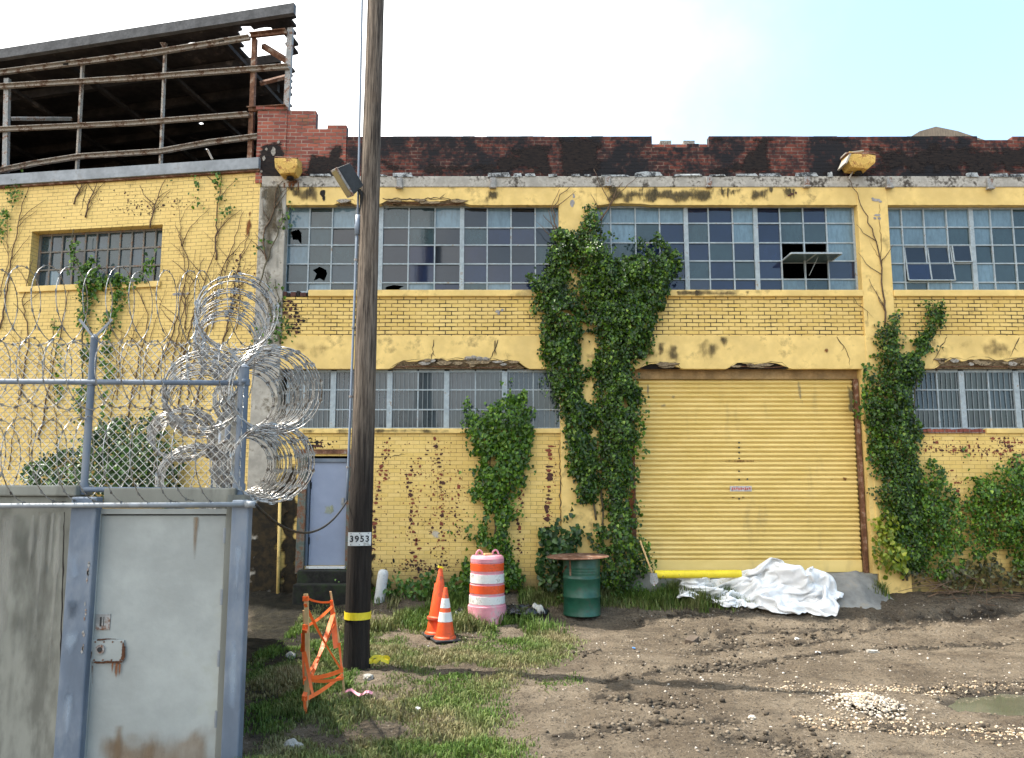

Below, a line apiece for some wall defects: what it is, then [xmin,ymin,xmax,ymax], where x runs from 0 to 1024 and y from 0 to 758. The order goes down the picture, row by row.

water stain [609,187,740,203]
water stain [752,187,795,199]
spalling [382,199,468,207]
spalling [390,355,524,369]
spalling [933,357,1024,369]